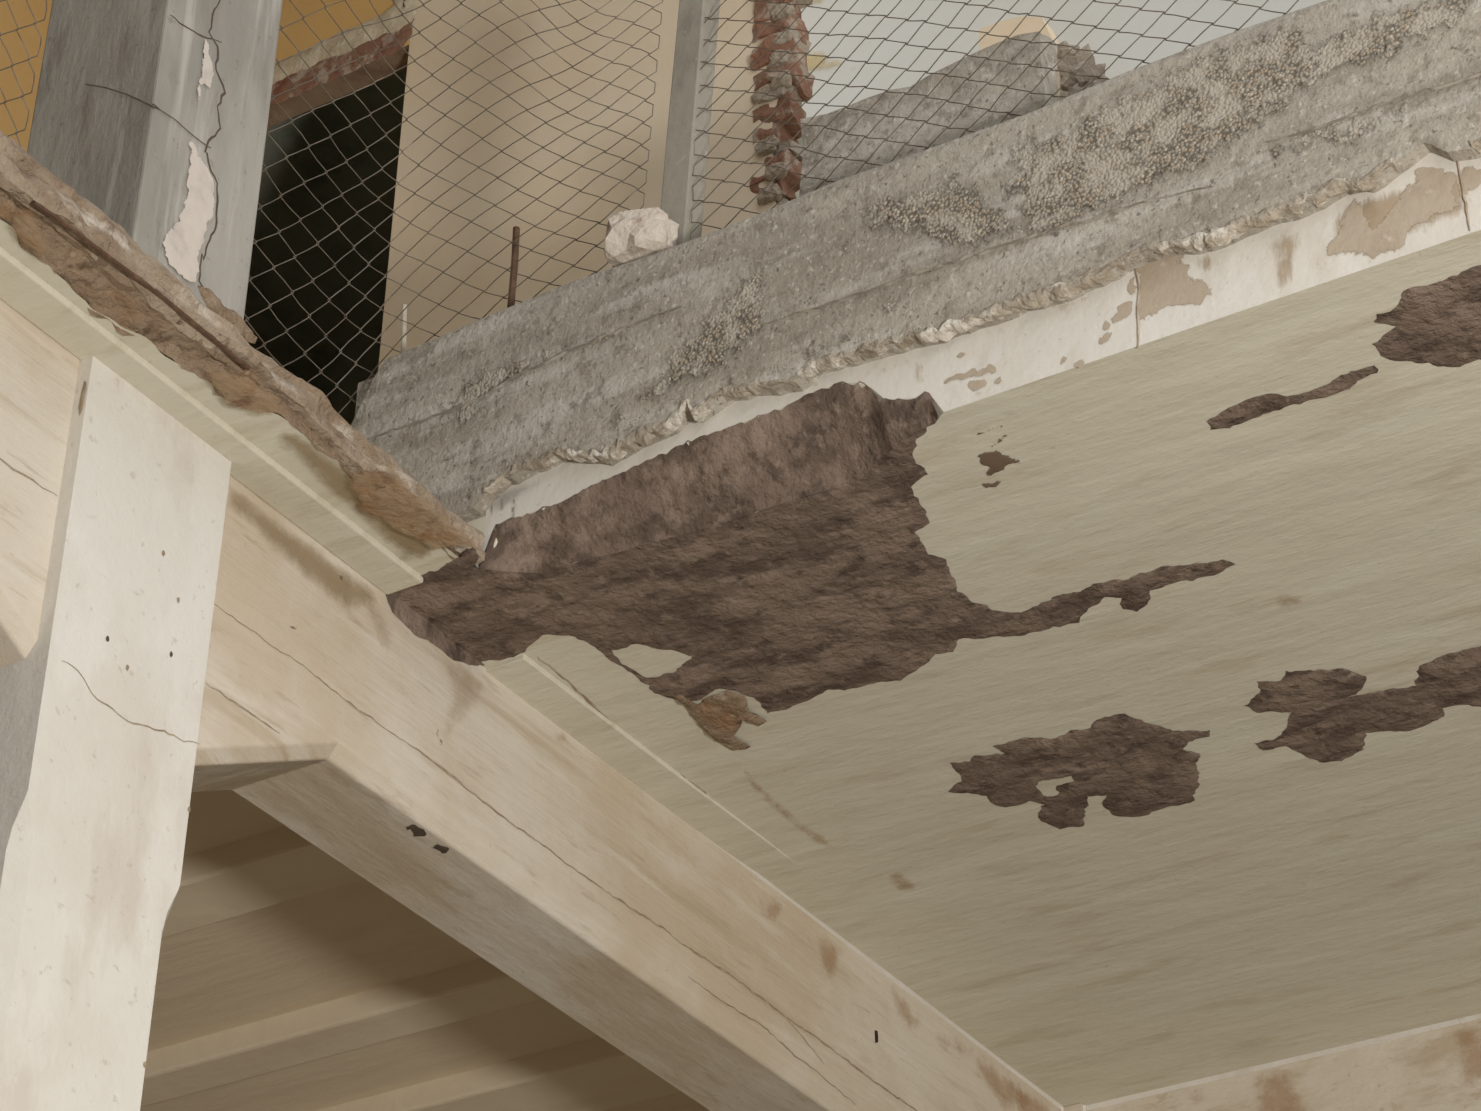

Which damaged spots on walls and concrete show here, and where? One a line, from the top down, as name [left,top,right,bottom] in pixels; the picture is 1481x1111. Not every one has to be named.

crack [171,0,226,287]
flaking render [270,0,418,107]
spalling [749,0,815,205]
water stain [1363,194,1401,230]
peeling [1327,167,1481,259]
flaking render [1207,265,1481,430]
crack [0,458,57,496]
flaking render [0,130,1235,751]
crack [62,660,199,744]
flaking render [1245,646,1481,763]
flaking render [948,713,1210,829]
crack [206,603,917,1111]